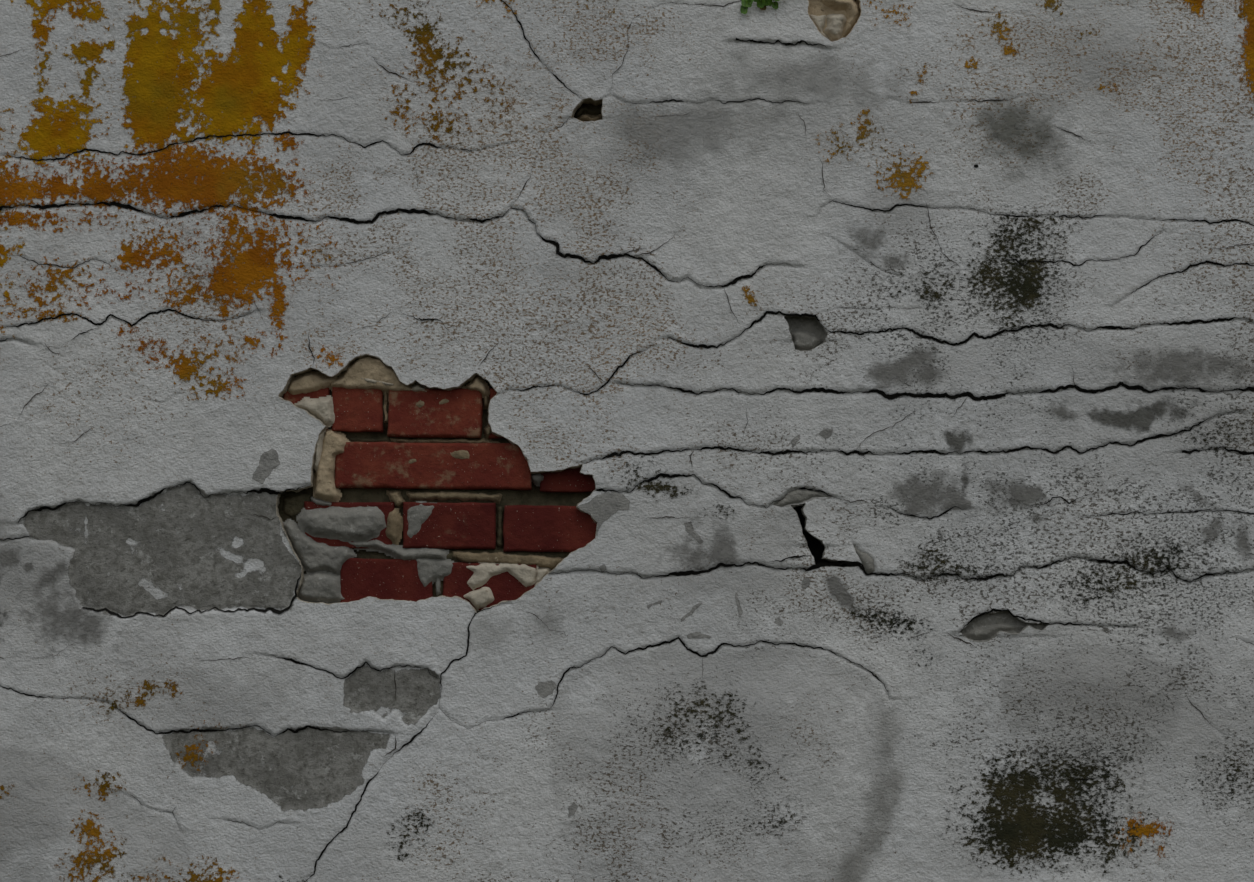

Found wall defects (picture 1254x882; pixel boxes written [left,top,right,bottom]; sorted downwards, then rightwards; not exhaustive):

corrosion [1180,0,1205,17]
corrosion [1227,0,1254,110]
hole [571,98,603,122]
crack [0,0,1254,523]
spalling [784,315,828,351]
flaking render [23,353,630,617]
crack [550,555,1248,647]
spalling [960,610,1051,642]
flaking render [343,665,441,725]
flaking render [162,726,390,812]